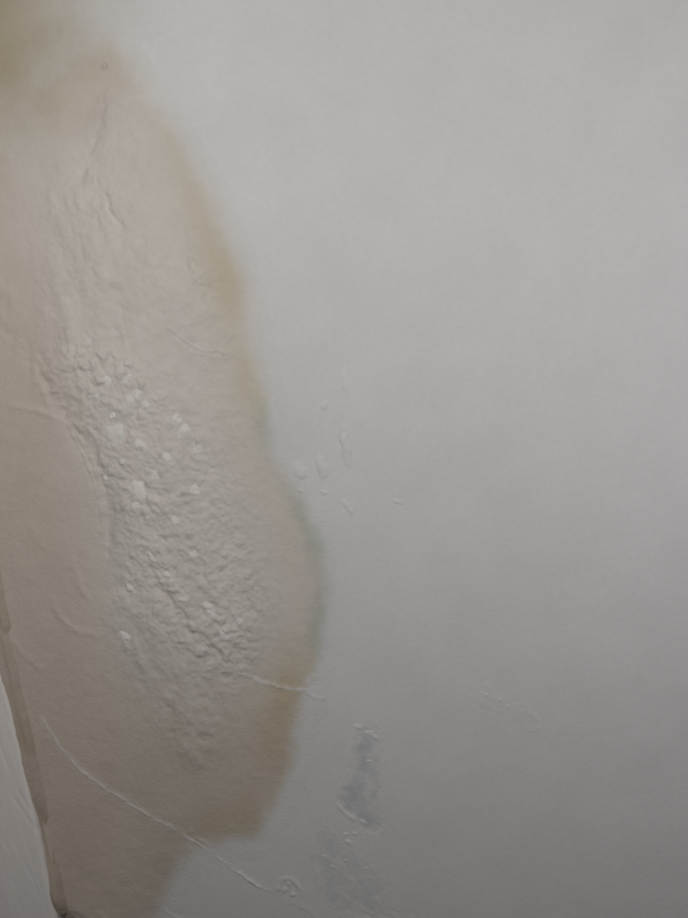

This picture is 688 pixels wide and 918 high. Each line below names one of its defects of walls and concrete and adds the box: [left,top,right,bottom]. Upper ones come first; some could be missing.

water stain [0,0,346,918]